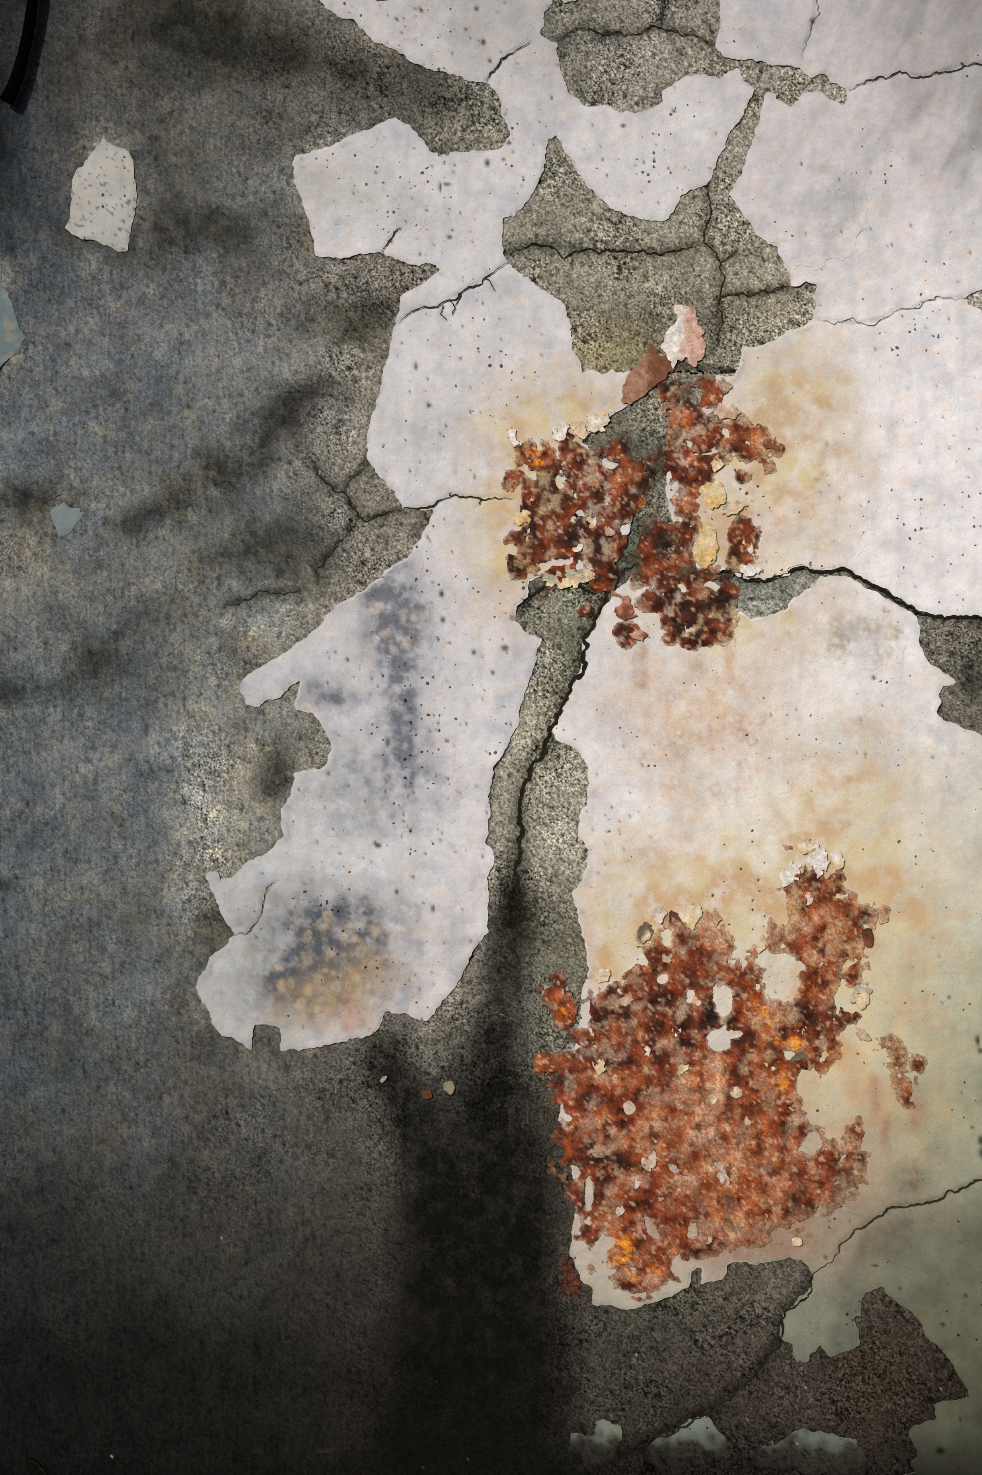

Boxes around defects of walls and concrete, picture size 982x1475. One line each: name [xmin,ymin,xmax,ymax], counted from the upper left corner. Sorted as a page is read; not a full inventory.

crack [486,0,714,81]
peeling [0,0,510,504]
crack [400,184,789,343]
peeling [502,0,847,436]
peeling [0,338,433,1475]
peeling [485,577,624,910]
crack [513,552,635,924]
rust [442,305,982,1302]
peeling [713,568,982,667]
crack [717,566,982,621]
peeling [553,1257,969,1475]
crack [620,1179,982,1457]